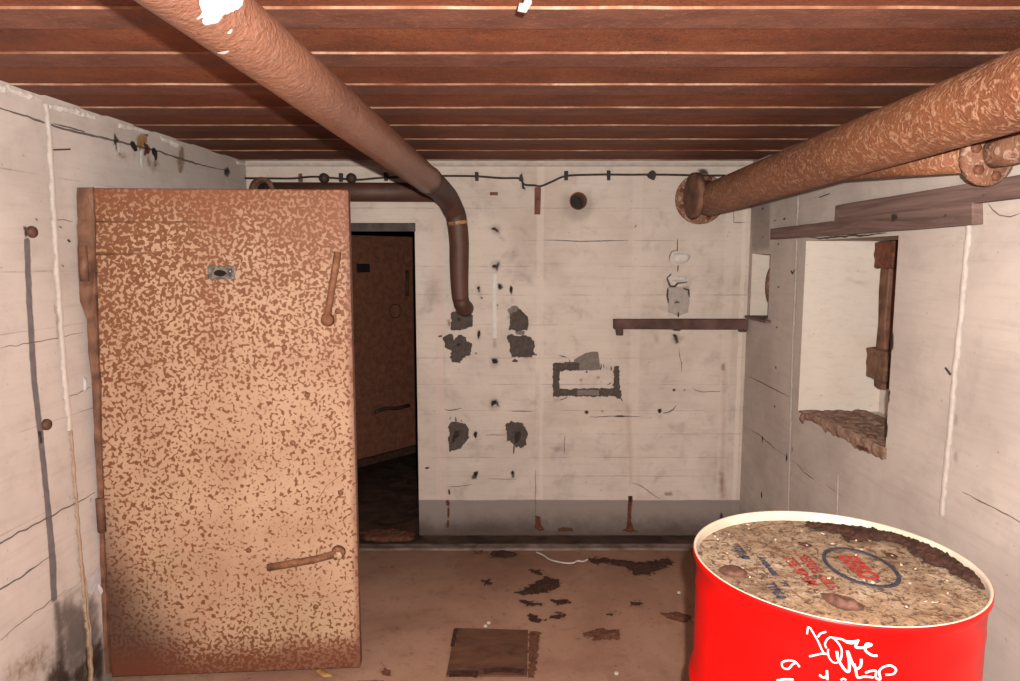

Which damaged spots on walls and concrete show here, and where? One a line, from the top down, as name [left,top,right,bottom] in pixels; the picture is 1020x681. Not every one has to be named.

spalling [438,311,480,363]
spalling [497,305,537,362]
spalling [448,418,477,452]
spalling [505,421,528,454]
rust [623,496,637,532]